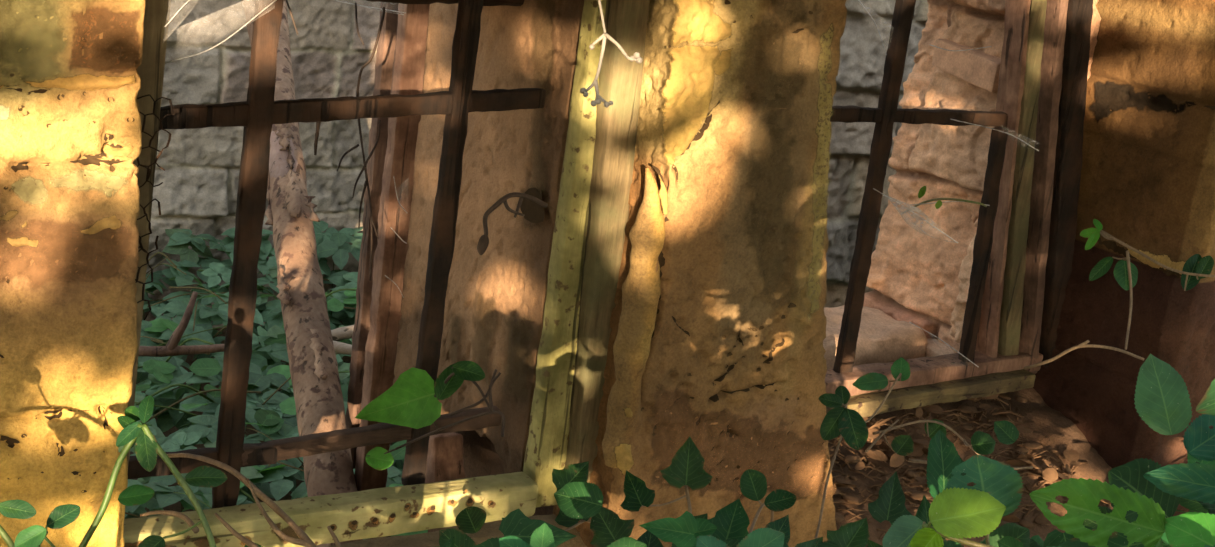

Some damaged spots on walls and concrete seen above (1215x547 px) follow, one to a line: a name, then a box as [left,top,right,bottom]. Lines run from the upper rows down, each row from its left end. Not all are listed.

crack [11,133,124,172]
crack [652,101,720,222]
crack [651,251,665,338]
crack [709,382,776,402]
crack [5,405,112,430]